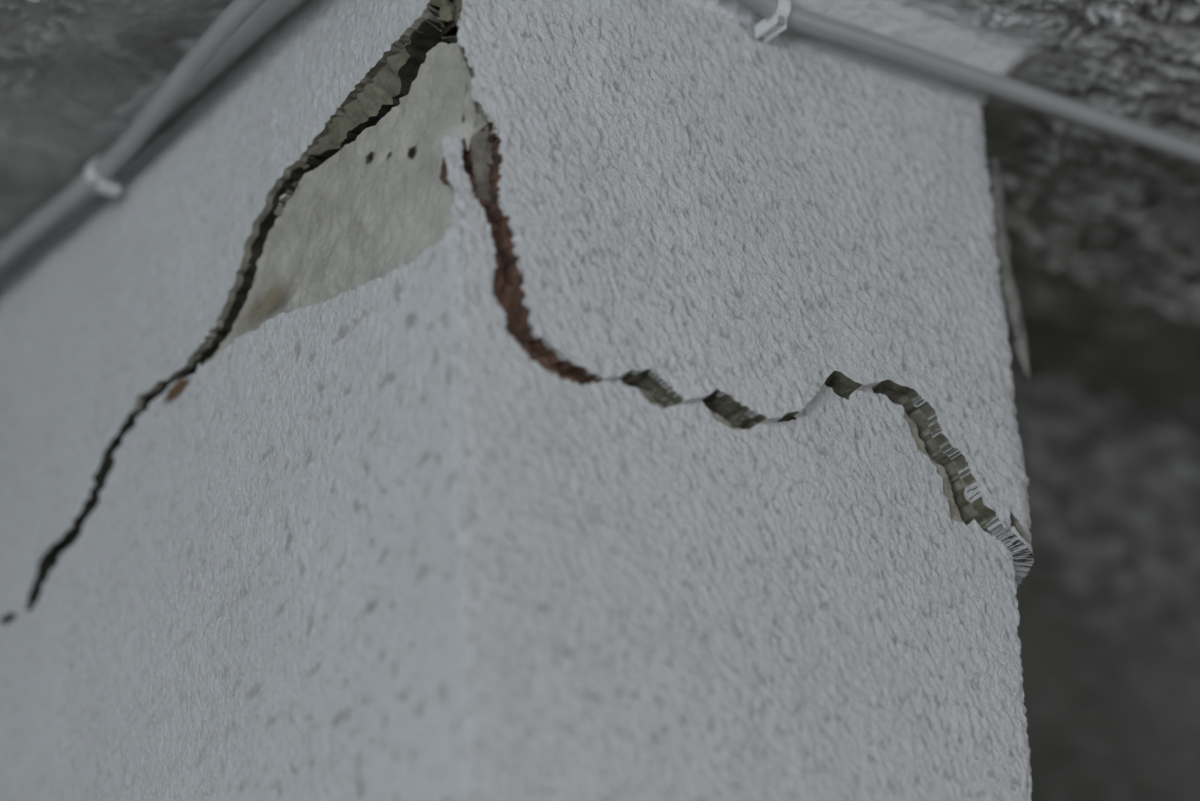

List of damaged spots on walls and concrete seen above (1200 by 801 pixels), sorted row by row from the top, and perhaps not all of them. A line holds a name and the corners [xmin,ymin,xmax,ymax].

crack [0,0,464,626]
spalling [190,0,499,366]
crack [439,120,799,430]
crack [824,370,1002,537]